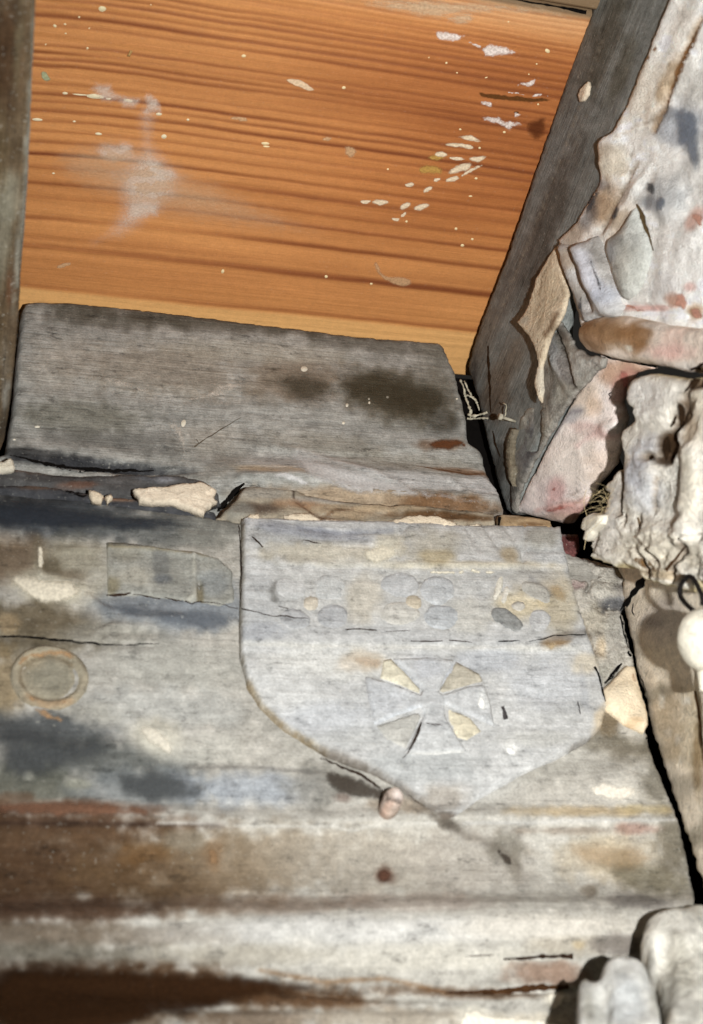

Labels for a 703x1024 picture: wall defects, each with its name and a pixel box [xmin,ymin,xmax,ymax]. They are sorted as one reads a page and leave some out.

corrosion [431,440,465,449]
crack [10,455,154,497]
peeling [132,482,218,518]
crack [0,635,160,646]
water stain [0,971,309,1024]